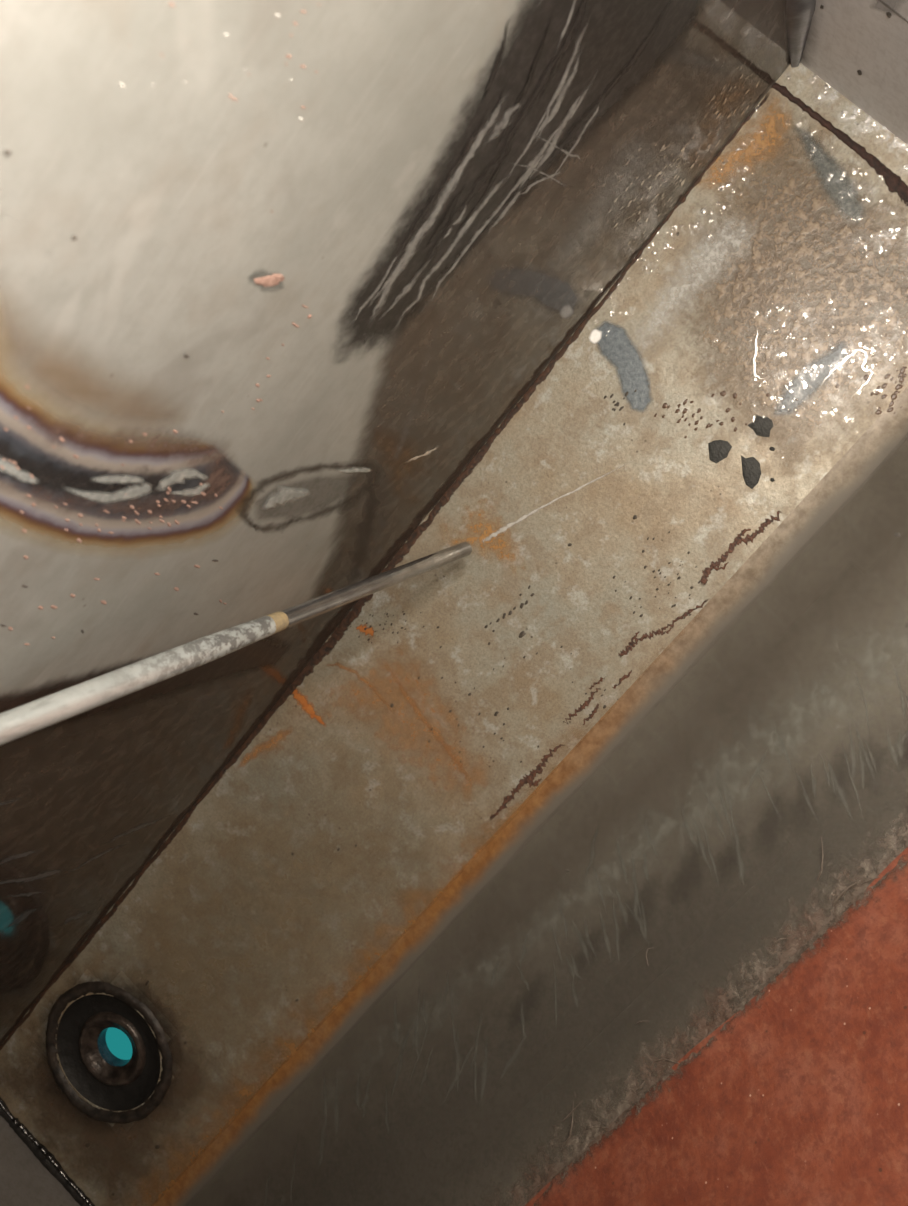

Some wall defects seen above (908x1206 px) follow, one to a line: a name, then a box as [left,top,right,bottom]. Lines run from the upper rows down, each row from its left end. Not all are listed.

leakage [0,0,791,598]
crack [382,83,908,573]
leakage [0,599,359,1045]
crack [0,594,373,1050]
crack [490,511,781,819]